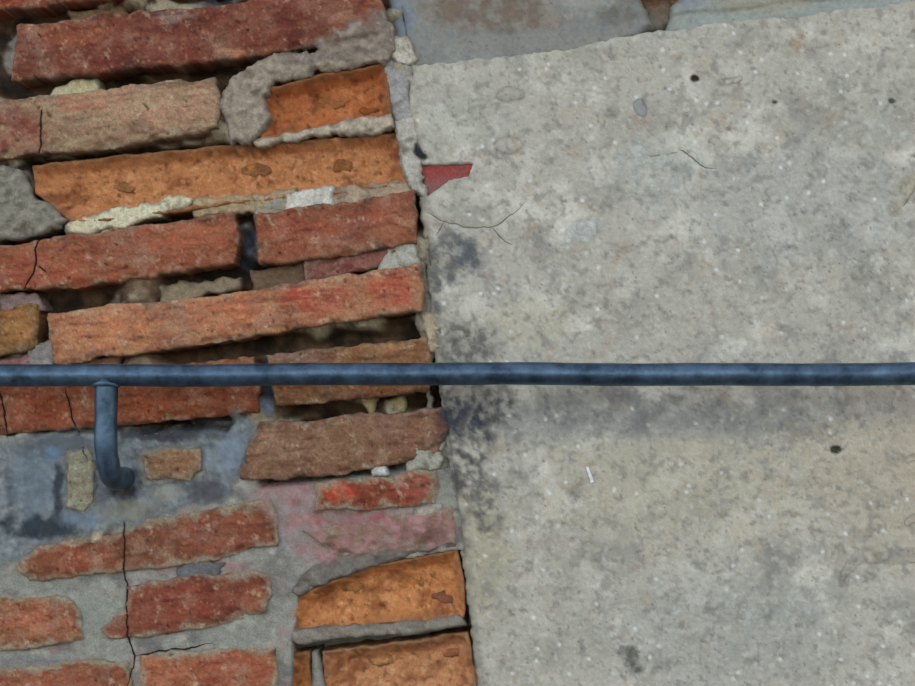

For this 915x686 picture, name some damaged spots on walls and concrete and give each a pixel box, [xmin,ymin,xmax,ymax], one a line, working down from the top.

spalling [32,64,406,222]
flaking render [414,143,473,201]
crack [123,521,211,686]
spalling [292,550,478,686]